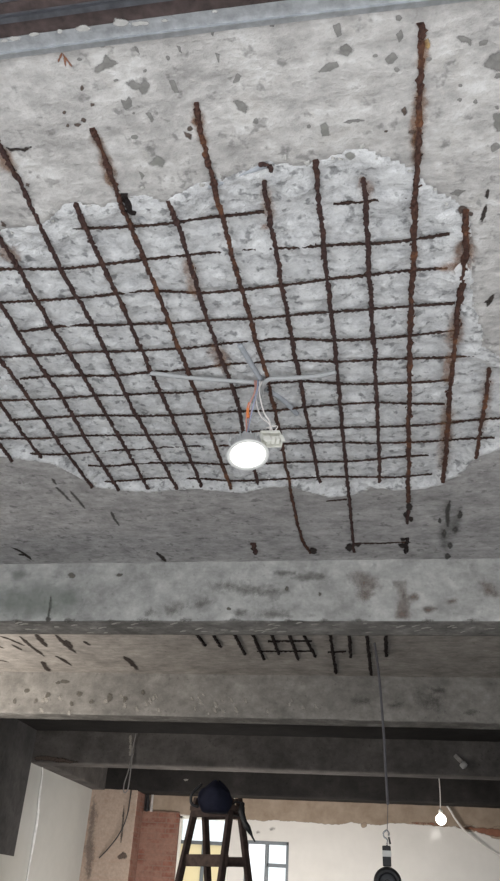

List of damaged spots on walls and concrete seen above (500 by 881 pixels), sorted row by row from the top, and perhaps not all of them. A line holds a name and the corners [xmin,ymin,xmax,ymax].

rust [440,242,472,270]
spalling [0,22,500,559]
spalling [233,635,317,661]
spalling [328,635,353,674]
spalling [365,636,373,676]